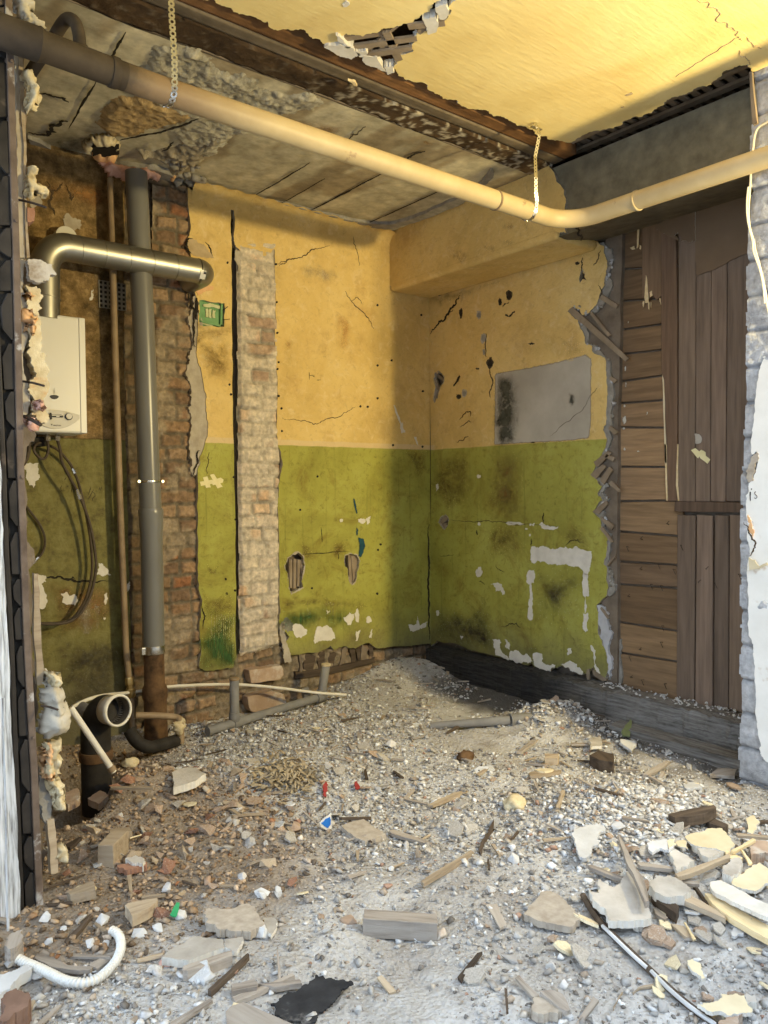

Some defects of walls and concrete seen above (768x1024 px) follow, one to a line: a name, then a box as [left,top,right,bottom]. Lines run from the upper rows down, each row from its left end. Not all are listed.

crack [112,32,126,55]
crack [28,82,96,137]
spalling [139,43,324,116]
spalling [94,95,249,258]
flaking render [262,197,466,229]
crack [430,291,460,334]
crack [284,407,354,425]
leakage [496,380,514,442]
flaking render [123,271,144,730]
spalling [152,243,429,725]
flaking render [492,242,630,682]
leakage [203,603,234,665]